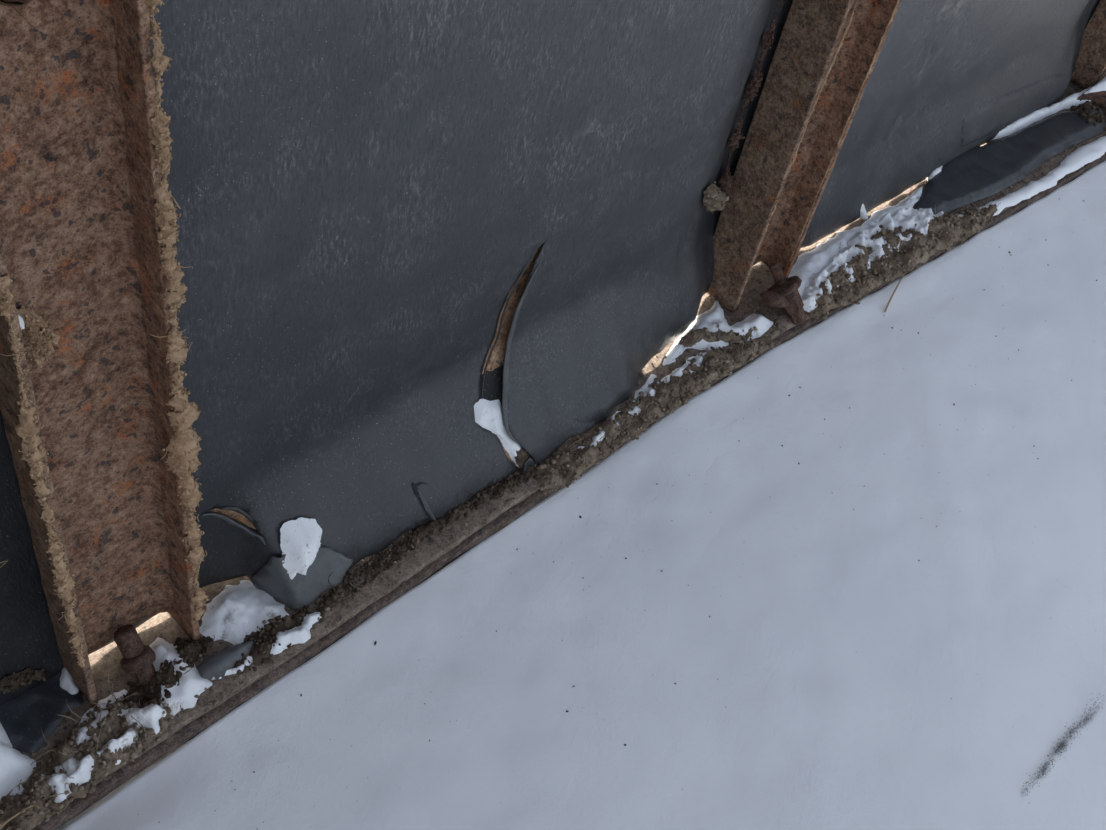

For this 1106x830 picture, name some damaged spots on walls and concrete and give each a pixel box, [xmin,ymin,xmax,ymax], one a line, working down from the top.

rust [717,0,784,195]